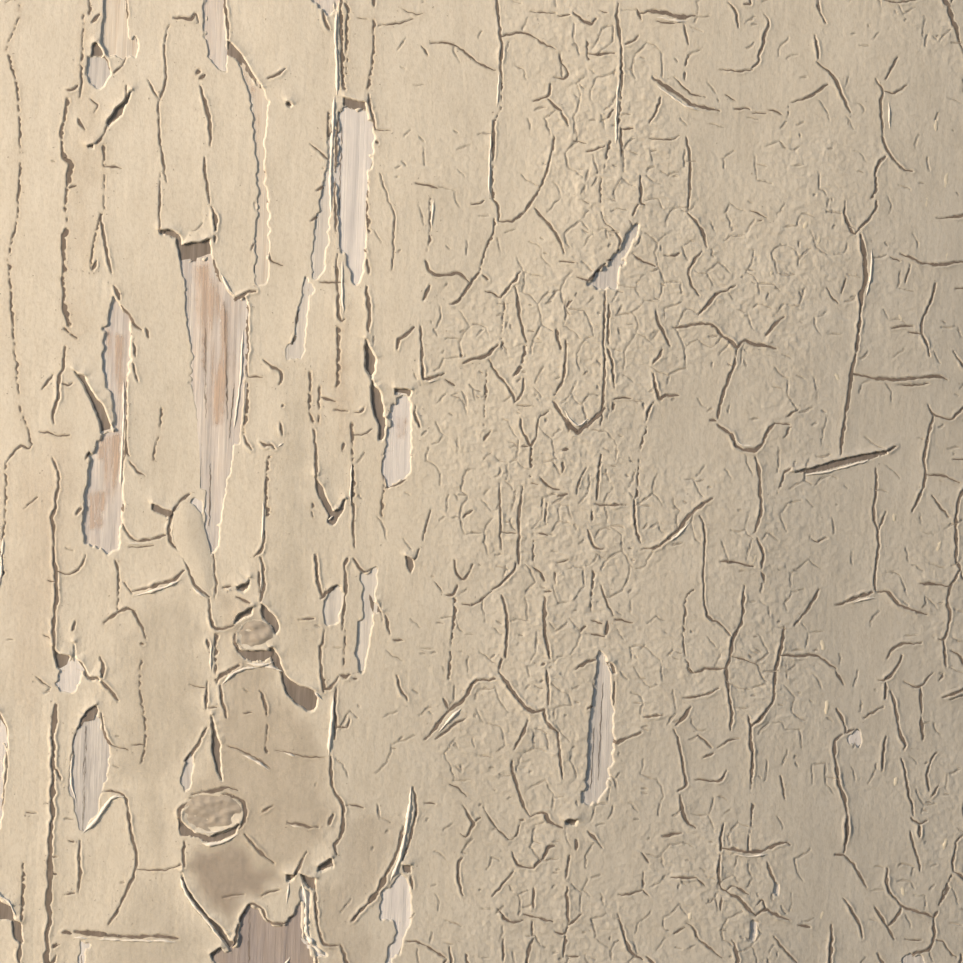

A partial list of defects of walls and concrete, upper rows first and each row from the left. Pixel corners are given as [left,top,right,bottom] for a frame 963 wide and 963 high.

peeling [311,98,374,285]
peeling [75,254,249,554]
peeling [382,389,411,487]
crack [311,0,963,963]
peeling [323,586,344,626]
peeling [355,567,378,671]
peeling [0,714,8,821]
peeling [56,658,84,693]
peeling [69,706,111,831]
peeling [582,651,616,805]
peeling [213,882,327,963]
peeling [380,874,413,963]